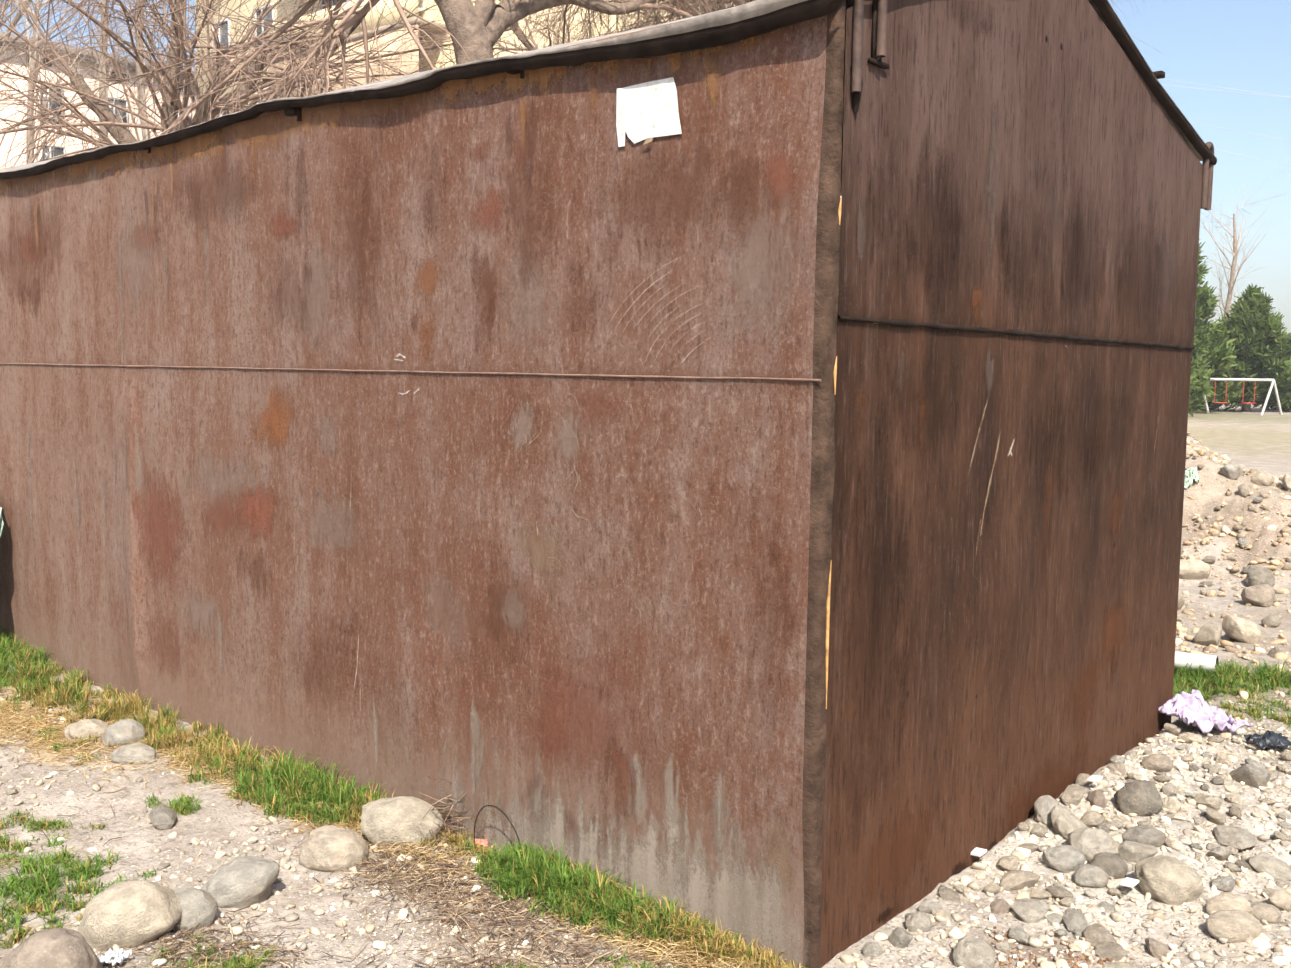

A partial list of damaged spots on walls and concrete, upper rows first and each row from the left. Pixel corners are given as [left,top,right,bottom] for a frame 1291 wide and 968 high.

corrosion [637,32,769,99]
corrosion [438,66,567,143]
corrosion [69,128,221,204]
corrosion [253,390,292,446]
corrosion [605,736,638,821]
water stain [437,712,802,968]